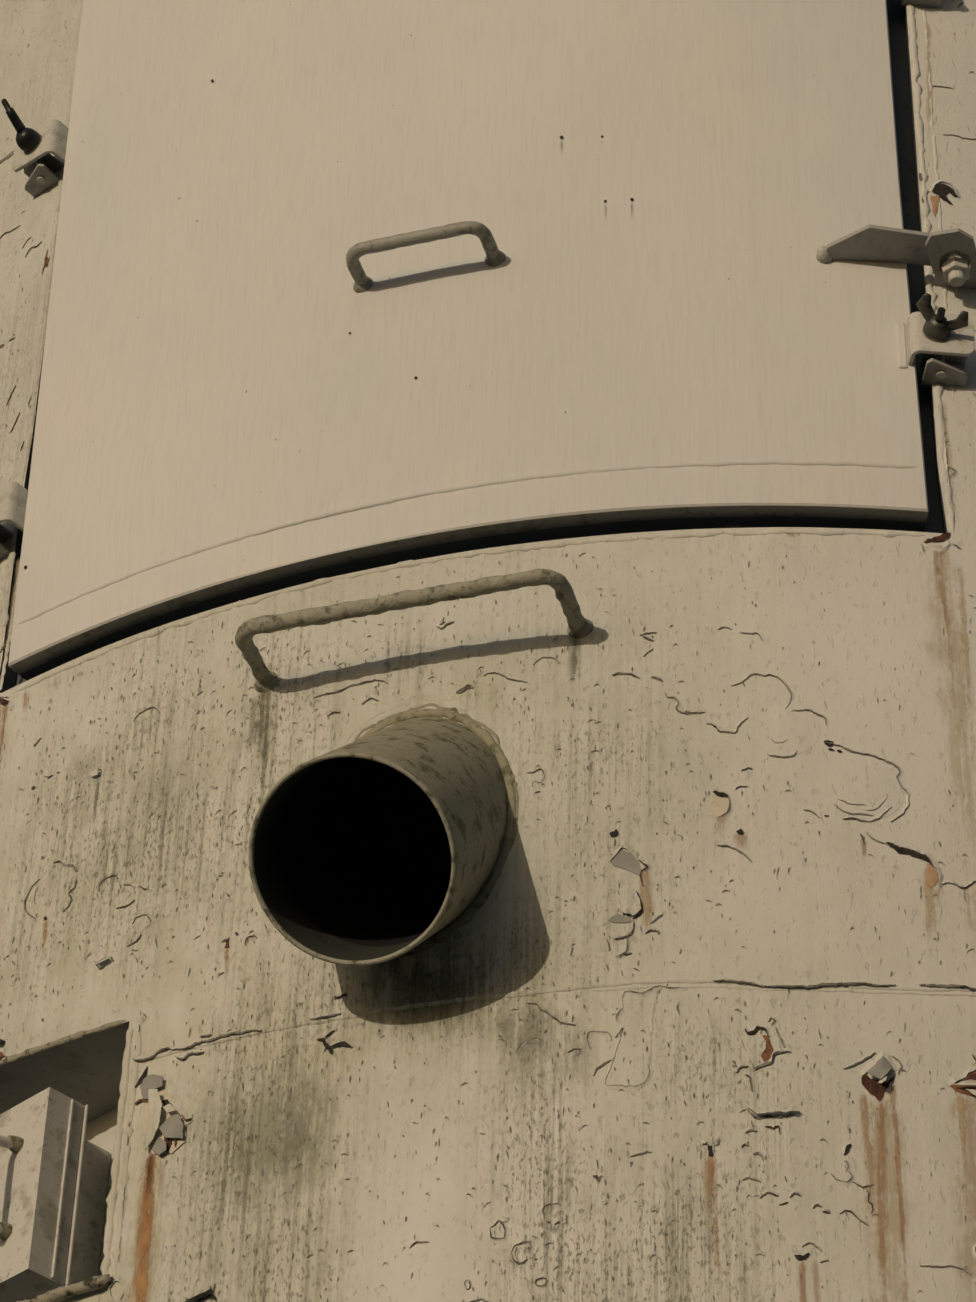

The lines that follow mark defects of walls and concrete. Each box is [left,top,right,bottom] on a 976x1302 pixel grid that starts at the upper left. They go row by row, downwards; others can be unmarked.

peeling [604,829,651,960]
peeling [886,836,944,892]
crack [712,977,976,990]
crack [132,1011,261,1061]
crack [309,991,355,1054]
crack [516,1000,623,1059]
peeling [134,1067,195,1155]
peeling [734,1016,800,1160]
rust [861,1096,872,1173]
peeling [843,1051,904,1101]
crack [118,1123,130,1263]
rust [135,1155,154,1302]